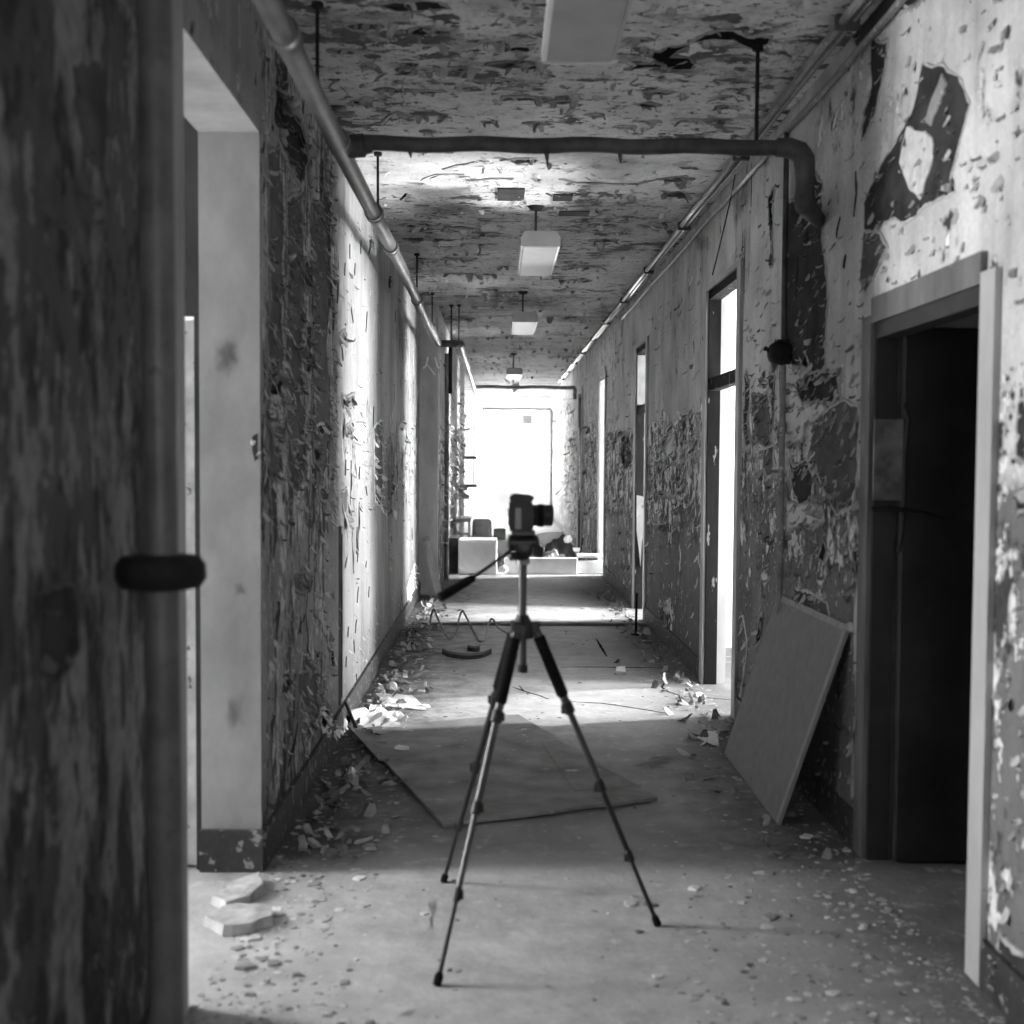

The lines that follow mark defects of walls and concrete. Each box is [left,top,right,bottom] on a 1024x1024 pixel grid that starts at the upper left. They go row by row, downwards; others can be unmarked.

peeling [341,0,452,45]
peeling [621,29,774,72]
peeling [326,38,740,135]
peeling [504,157,541,166]
peeling [657,177,696,203]
peeling [858,62,971,299]
peeling [398,224,499,284]
peeling [555,266,606,284]
peeling [250,83,412,532]
peeling [741,171,860,564]
peeling [644,406,696,499]
peeling [1012,488,1024,518]